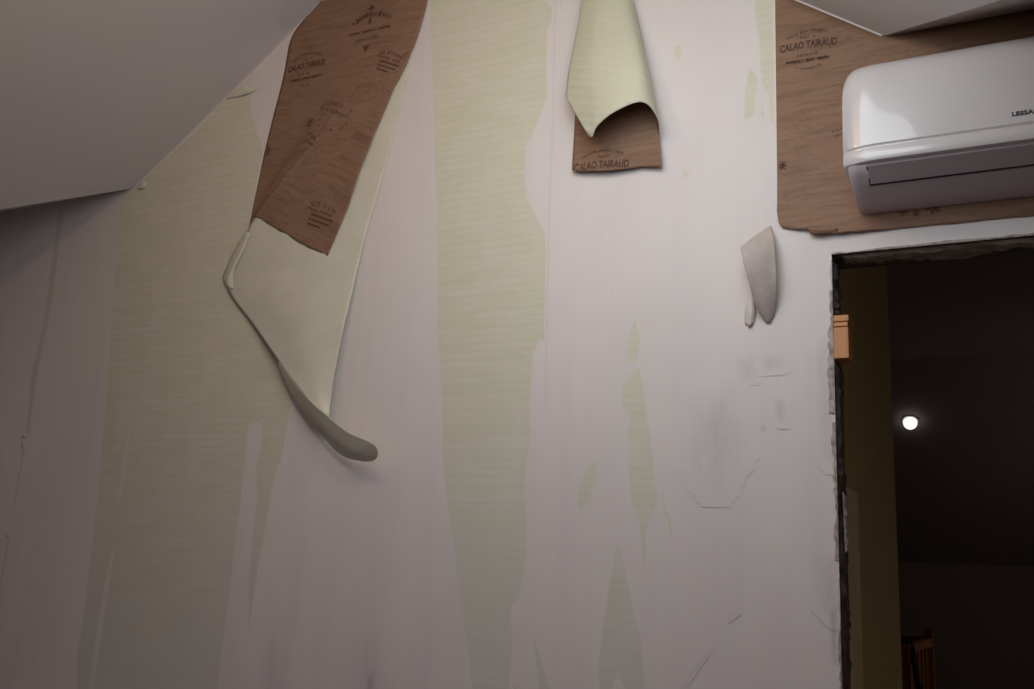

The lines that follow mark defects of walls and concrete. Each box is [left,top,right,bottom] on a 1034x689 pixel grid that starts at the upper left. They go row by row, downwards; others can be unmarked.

peeling [73,84,298,689]
peeling [426,0,554,689]